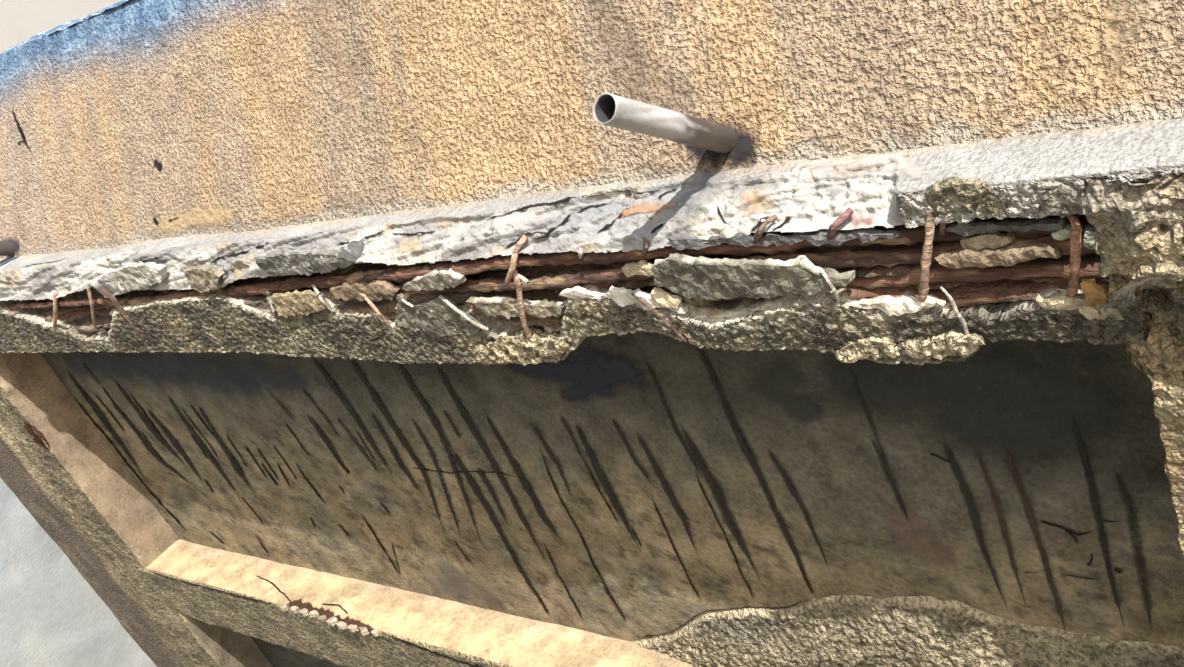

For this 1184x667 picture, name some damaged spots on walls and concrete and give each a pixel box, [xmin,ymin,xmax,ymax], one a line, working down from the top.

crack [12,111,30,151]
spalling [0,155,1184,419]
spalling [24,423,50,450]
crack [74,387,224,544]
crack [152,403,400,604]
crack [414,468,514,477]
crack [514,547,582,618]
damp [508,347,760,580]
crack [541,453,813,638]
crack [1023,520,1122,580]